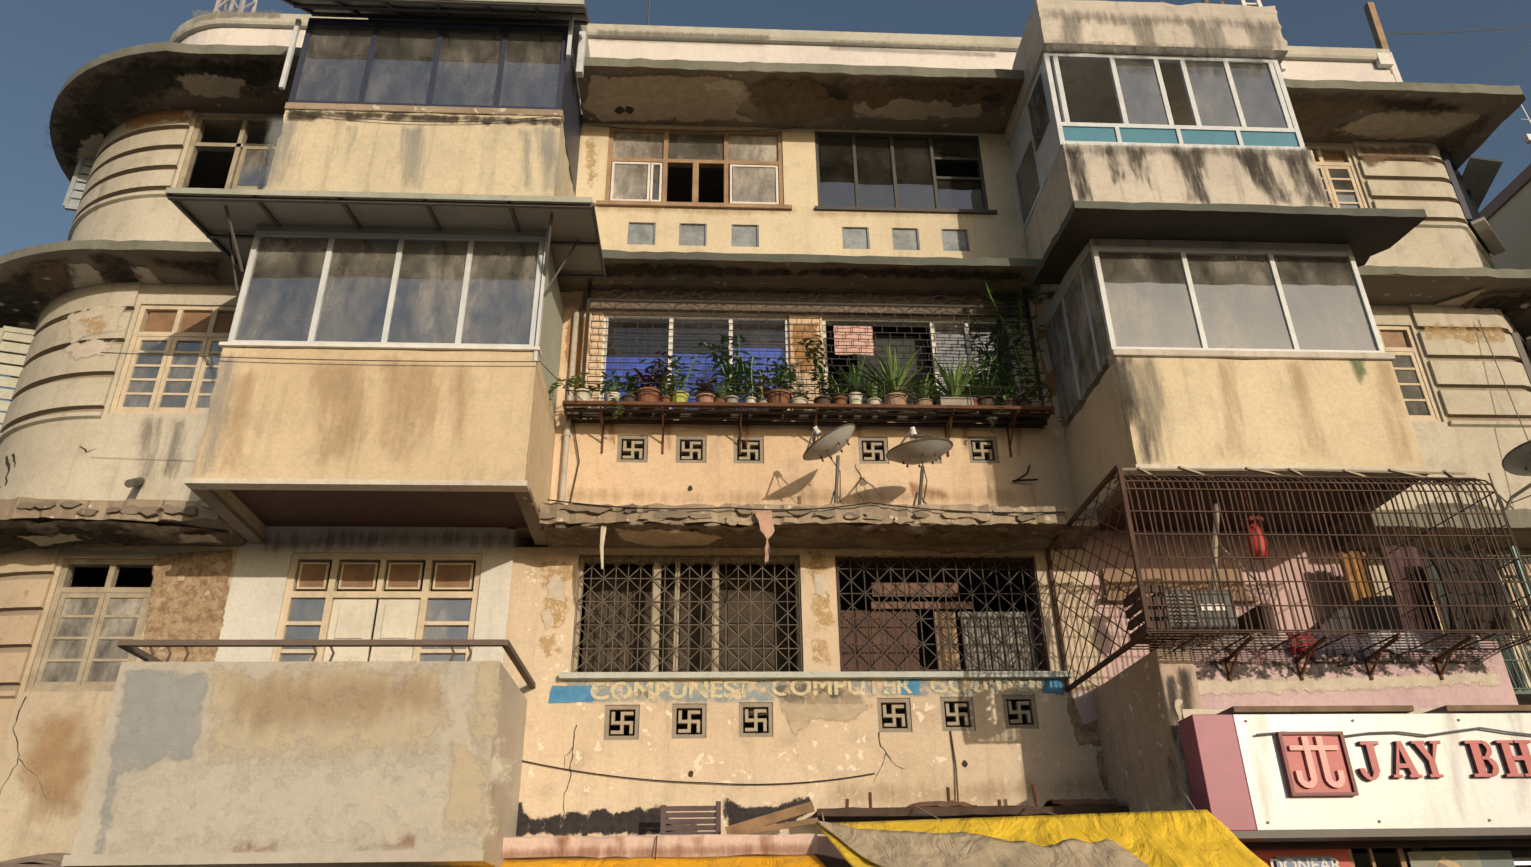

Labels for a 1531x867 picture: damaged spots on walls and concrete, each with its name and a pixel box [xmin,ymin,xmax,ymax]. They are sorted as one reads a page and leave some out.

peeling [124,72,246,128]
water stain [288,109,564,126]
flaking render [582,73,1021,123]
peeling [1334,109,1480,140]
water stain [1066,145,1210,204]
water stain [1223,148,1331,204]
peeling [66,304,126,360]
water stain [1351,360,1365,378]
water stain [1109,357,1159,460]
spalling [527,503,1093,547]
peeling [0,500,509,854]
crack [0,696,47,800]